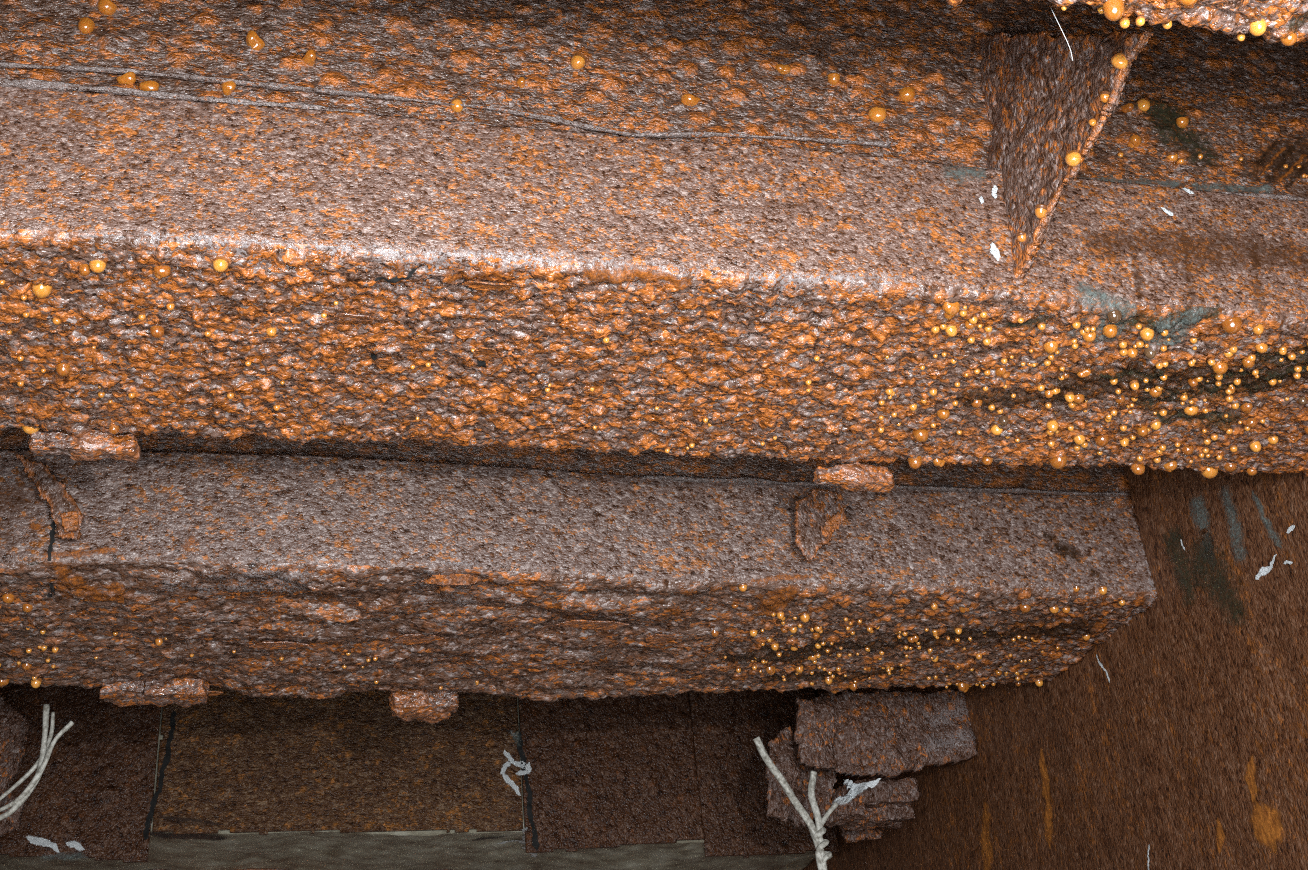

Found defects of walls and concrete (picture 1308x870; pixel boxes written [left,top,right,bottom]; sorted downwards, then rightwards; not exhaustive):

rust [446,270,517,292]
rust [583,261,691,290]
rust [1089,232,1308,307]
rust [60,511,78,533]
rust [822,511,841,537]
rust [43,547,125,603]
rust [421,573,481,586]
rust [748,574,808,617]
rust [1039,749,1053,847]
rust [1245,756,1284,848]
rust [980,802,993,870]